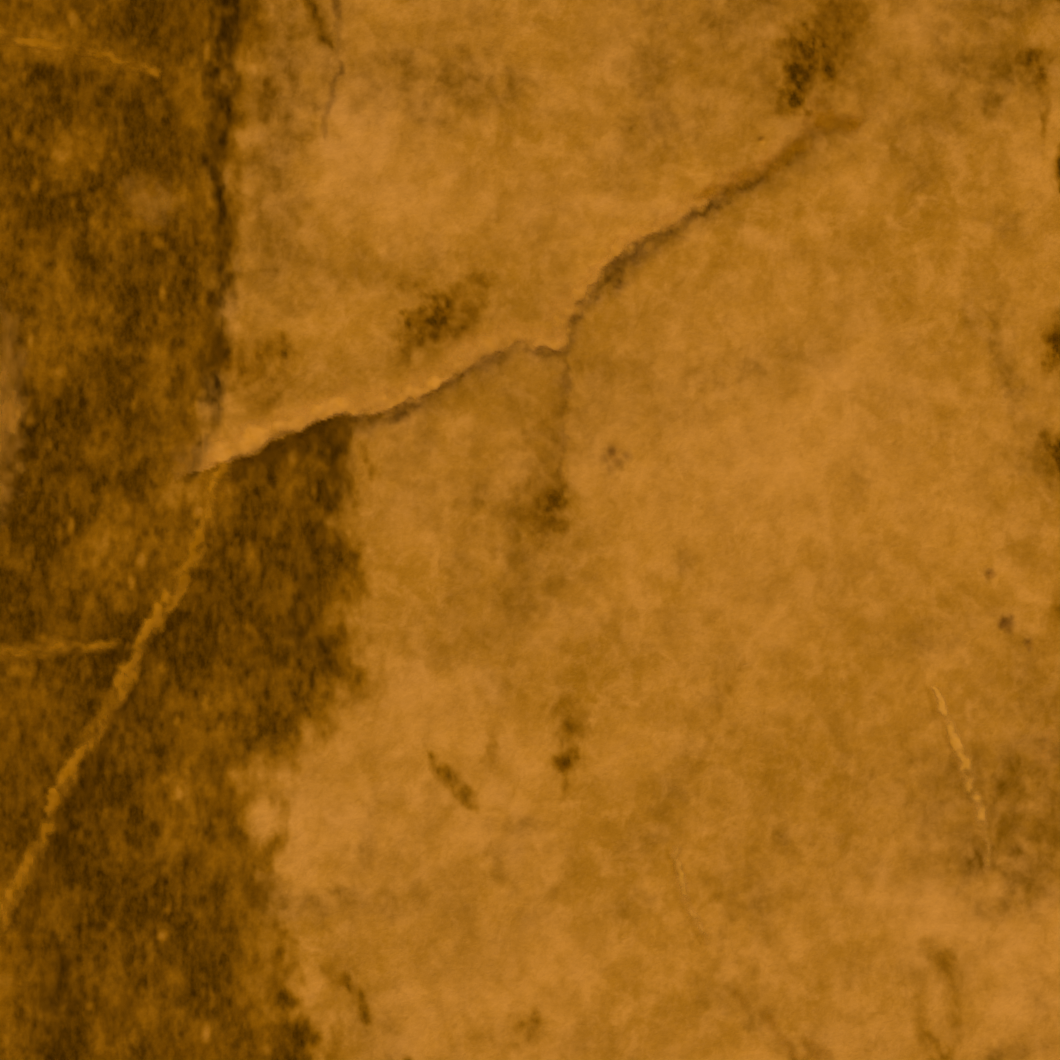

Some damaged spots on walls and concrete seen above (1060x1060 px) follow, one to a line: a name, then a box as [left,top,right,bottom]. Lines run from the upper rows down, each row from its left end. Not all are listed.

leakage [0,0,358,1060]
crack [0,177,763,932]